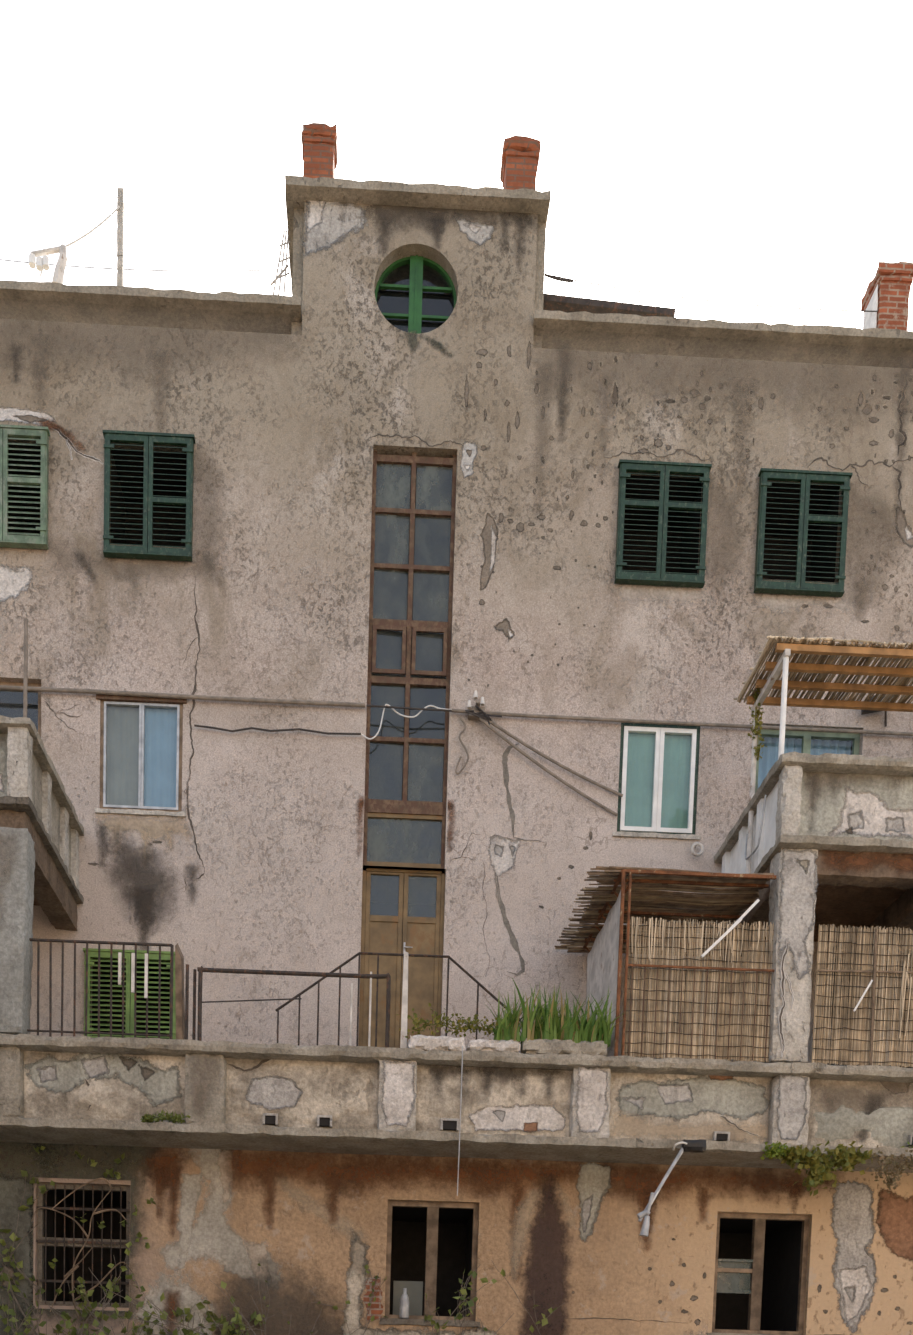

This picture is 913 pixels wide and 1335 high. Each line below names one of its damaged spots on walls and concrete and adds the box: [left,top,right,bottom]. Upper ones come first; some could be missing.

peeling [13,415,47,423]
crack [807,376,913,537]
flaking render [0,565,32,602]
crack [183,576,205,892]
crack [452,743,547,977]
water stain [215,1150,580,1335]
flaking render [341,1228,498,1335]
flaking render [576,1162,611,1242]
water stain [598,1162,835,1248]
flaking render [818,1180,913,1335]